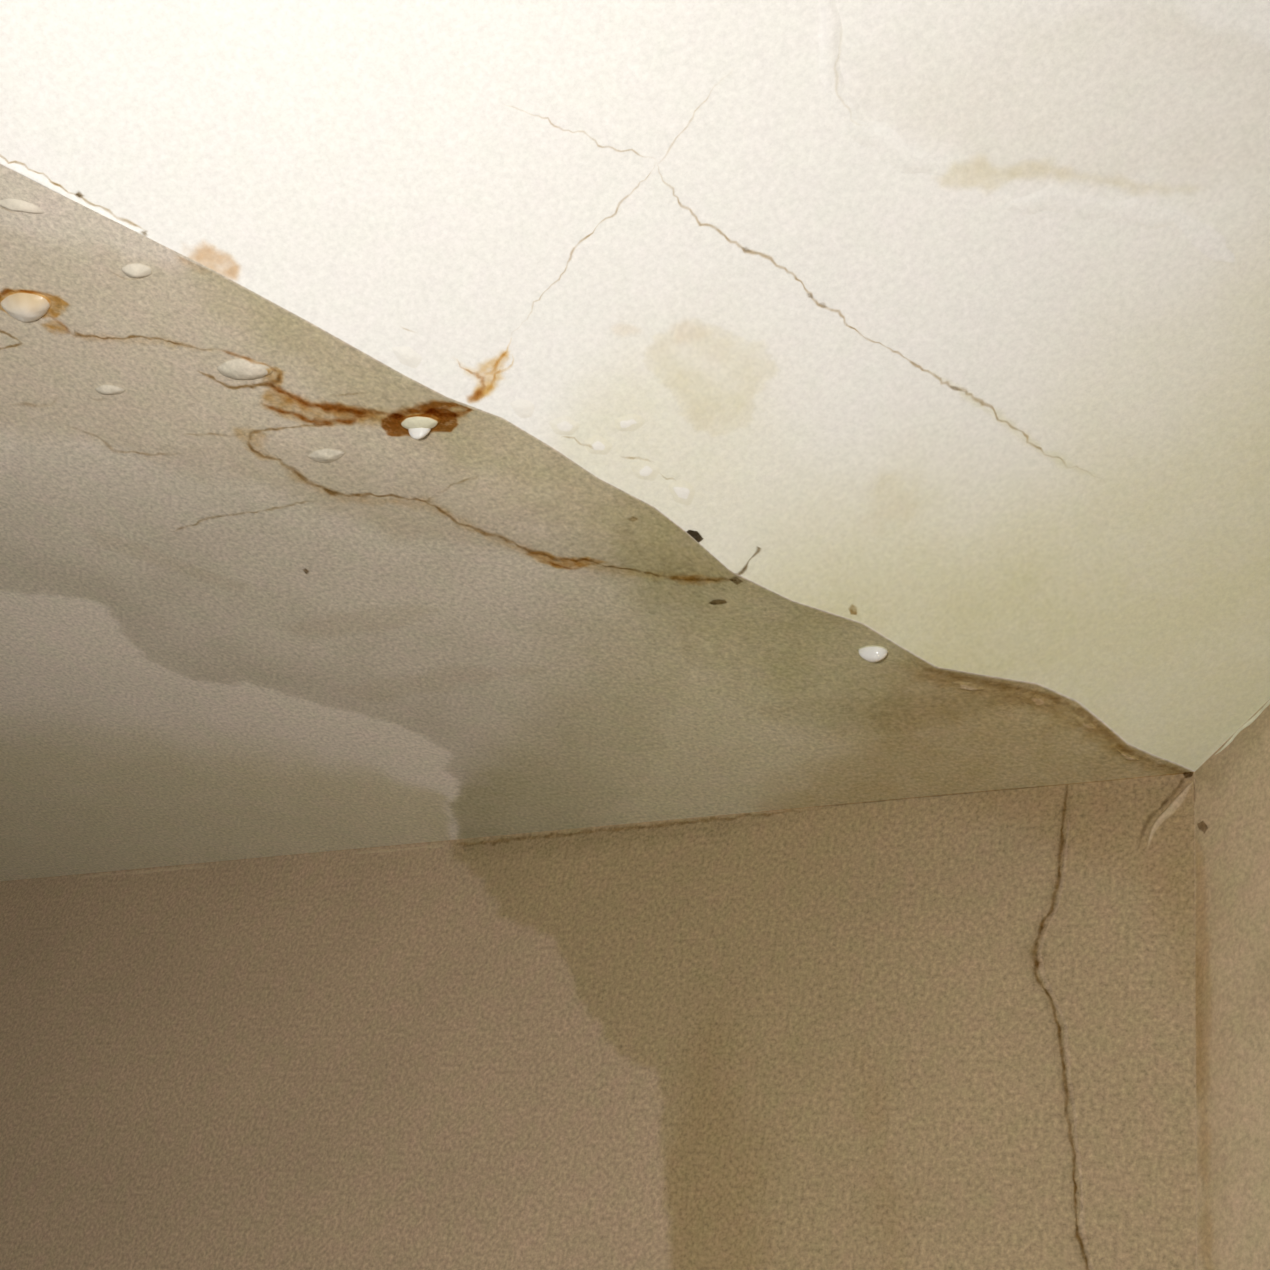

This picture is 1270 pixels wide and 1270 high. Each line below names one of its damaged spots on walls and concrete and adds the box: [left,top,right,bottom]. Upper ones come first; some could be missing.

crack [270,389,363,424]
corrosion [382,409,457,436]
crack [394,402,470,417]
peeling [687,530,703,542]